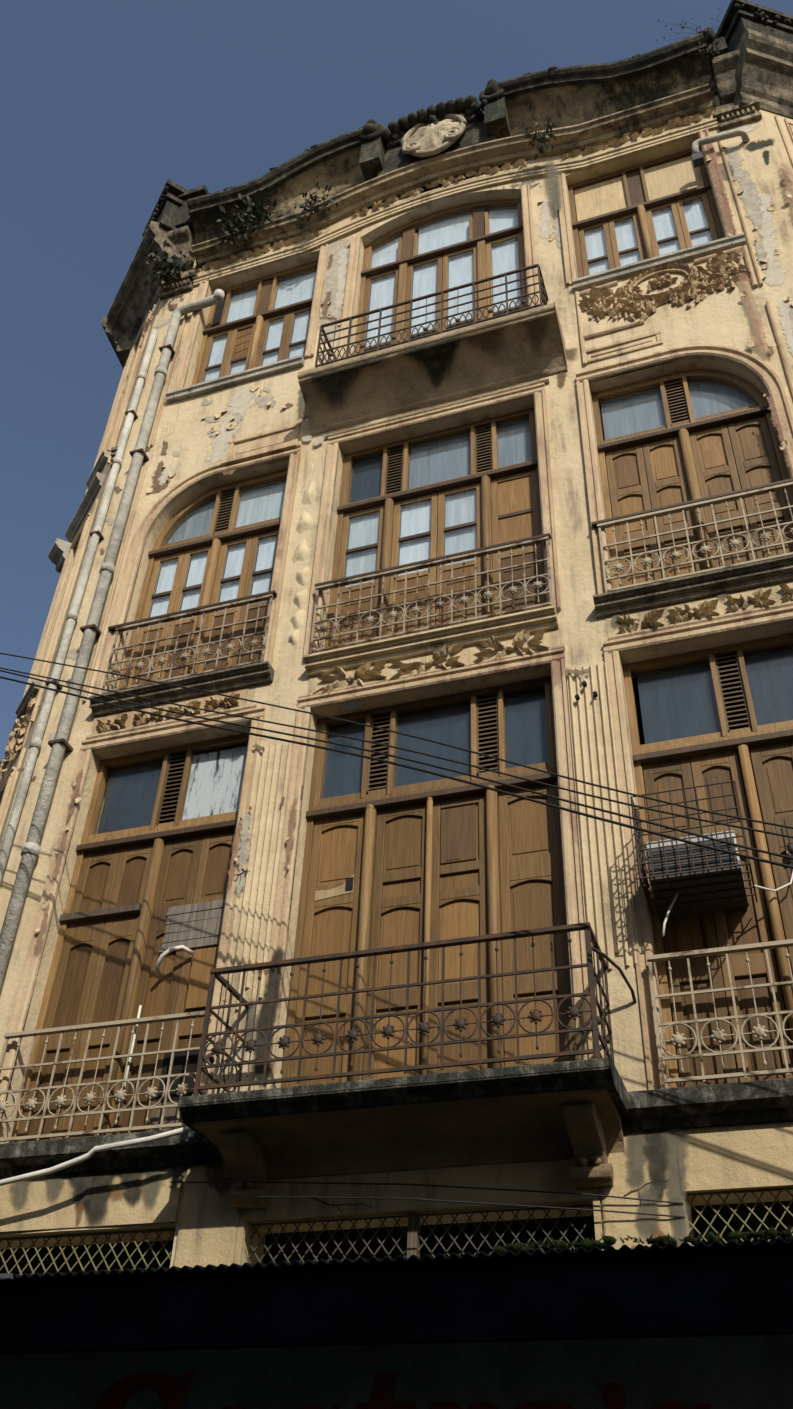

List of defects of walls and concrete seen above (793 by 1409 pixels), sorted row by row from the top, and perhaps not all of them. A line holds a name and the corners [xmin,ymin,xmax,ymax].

peeling [736,123,760,132]
peeling [318,239,350,342]
damp [298,325,504,418]
damp [524,317,548,351]
peeling [706,143,793,368]
peeling [145,440,180,493]
peeling [201,385,334,475]
peeling [763,393,793,475]
damp [247,947,284,1080]
damp [11,1180,30,1207]
damp [47,1165,187,1225]
damp [627,1127,689,1246]